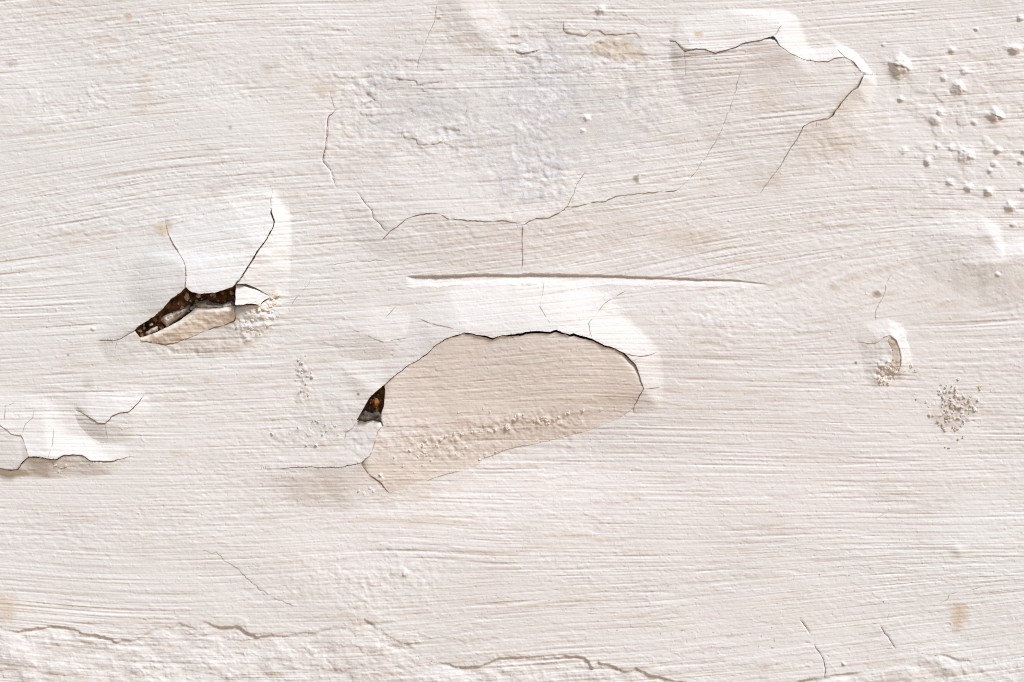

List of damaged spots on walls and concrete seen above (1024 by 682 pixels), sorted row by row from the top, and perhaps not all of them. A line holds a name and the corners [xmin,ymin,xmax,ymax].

crack [321,97,335,183]